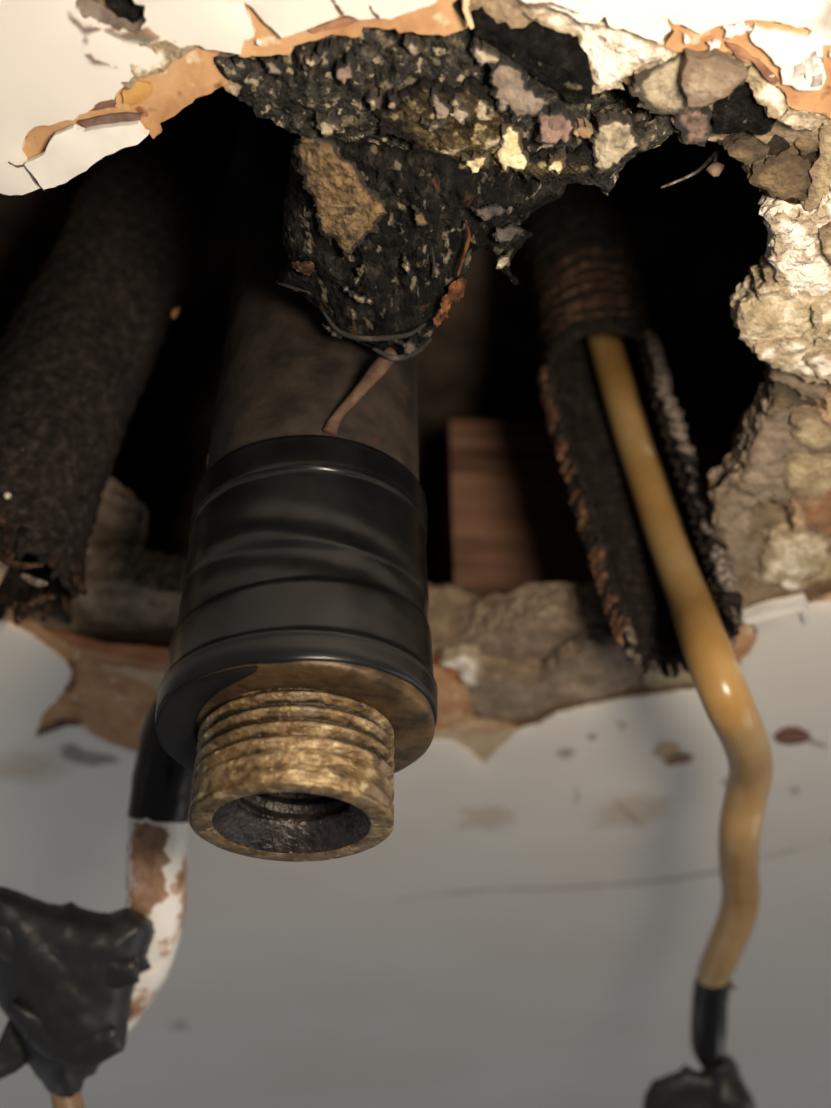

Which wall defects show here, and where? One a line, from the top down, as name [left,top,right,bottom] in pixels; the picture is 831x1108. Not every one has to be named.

spalling [22,0,831,662]
spalling [2,476,187,750]
spalling [428,580,695,764]